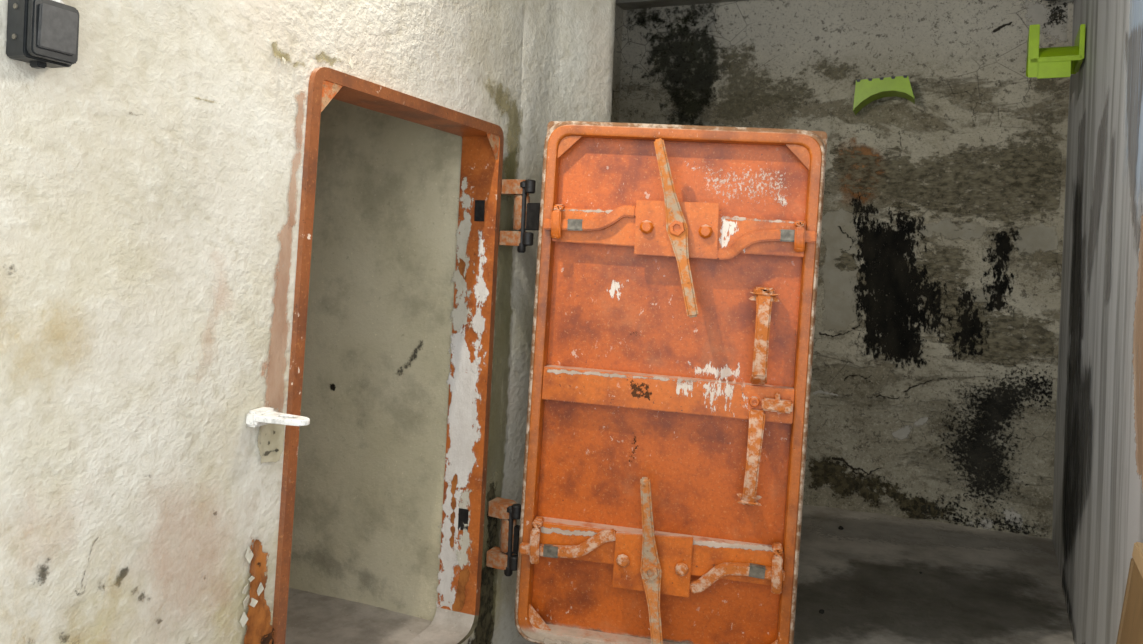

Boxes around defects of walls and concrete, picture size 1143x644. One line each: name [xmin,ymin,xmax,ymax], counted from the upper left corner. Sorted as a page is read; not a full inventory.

water stain [628,4,857,126]
water stain [1029,78,1062,98]
water stain [850,191,1021,369]
peeling [436,177,489,610]
water stain [902,362,1053,536]
water stain [1008,111,1092,641]
rust [240,539,274,644]